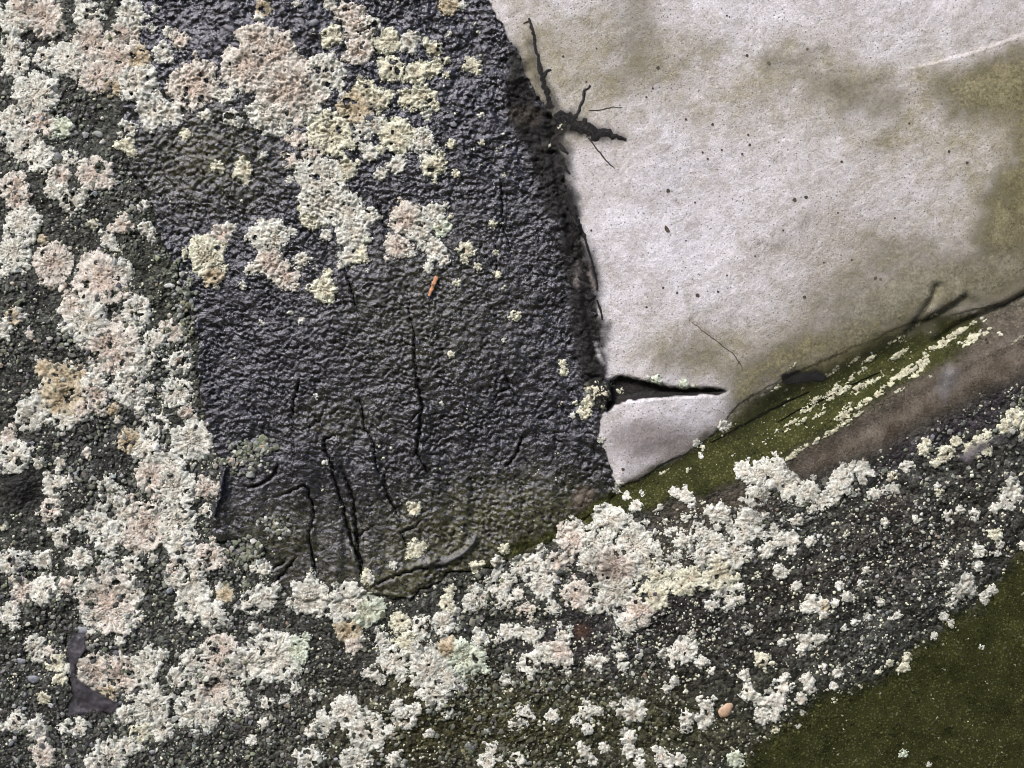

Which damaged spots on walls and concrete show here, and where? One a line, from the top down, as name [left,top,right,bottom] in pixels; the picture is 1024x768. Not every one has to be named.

crack [919,293,1024,321]
crack [396,292,428,473]
crack [605,375,727,411]
crack [710,371,881,443]
damp [781,370,826,384]
damp [798,336,1024,472]
crack [245,381,426,590]